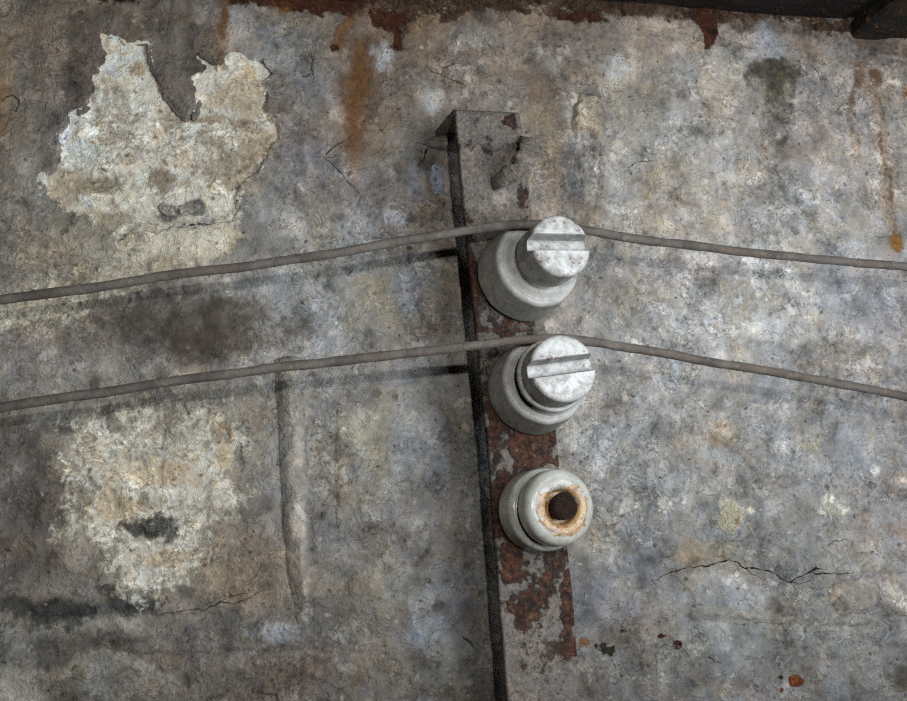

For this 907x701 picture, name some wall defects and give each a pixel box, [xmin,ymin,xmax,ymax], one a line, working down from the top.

rust [218,0,855,148]
peeling [0,33,286,334]
crack [649,559,854,584]
rust [779,674,804,692]